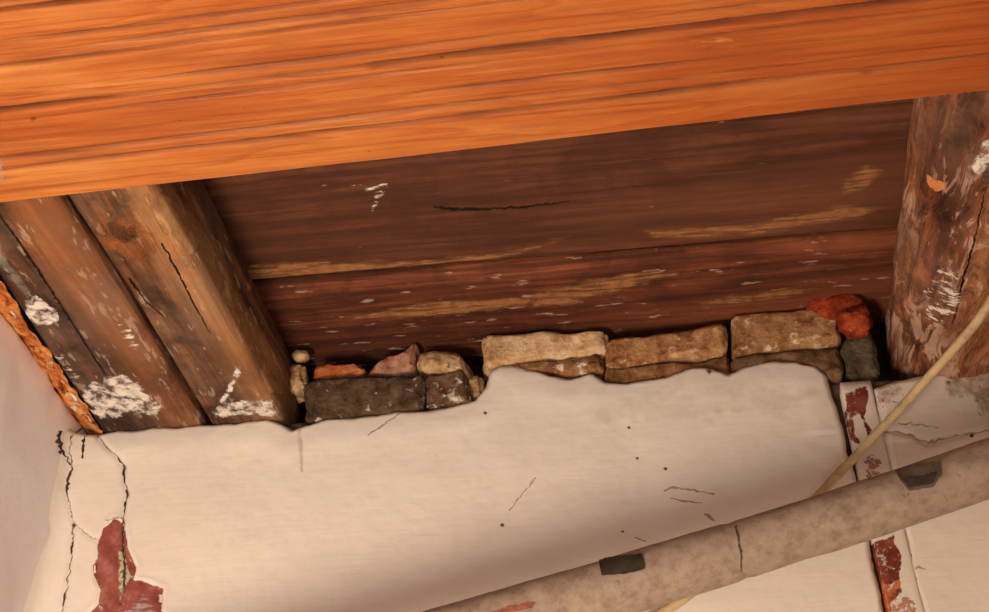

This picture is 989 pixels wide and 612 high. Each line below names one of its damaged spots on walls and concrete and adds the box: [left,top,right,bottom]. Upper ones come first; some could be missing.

crack [884,421,988,444]
crack [55,428,129,612]
peeling [91,519,163,612]